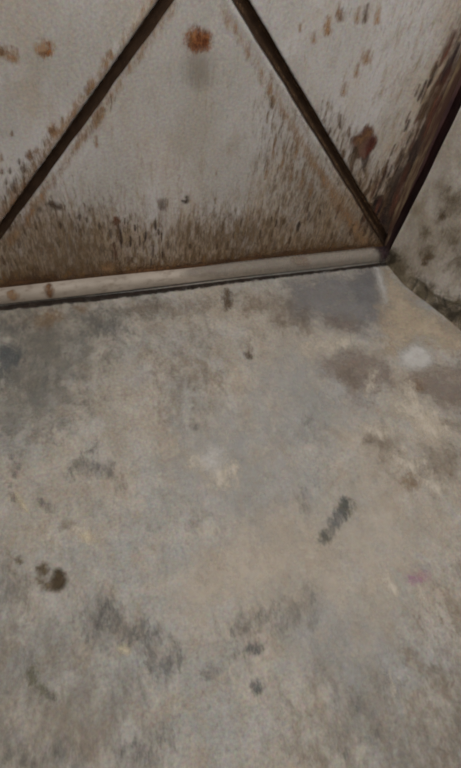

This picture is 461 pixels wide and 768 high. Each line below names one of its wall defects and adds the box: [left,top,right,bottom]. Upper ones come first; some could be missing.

rust [0,28,461,301]
damp [387,250,461,330]